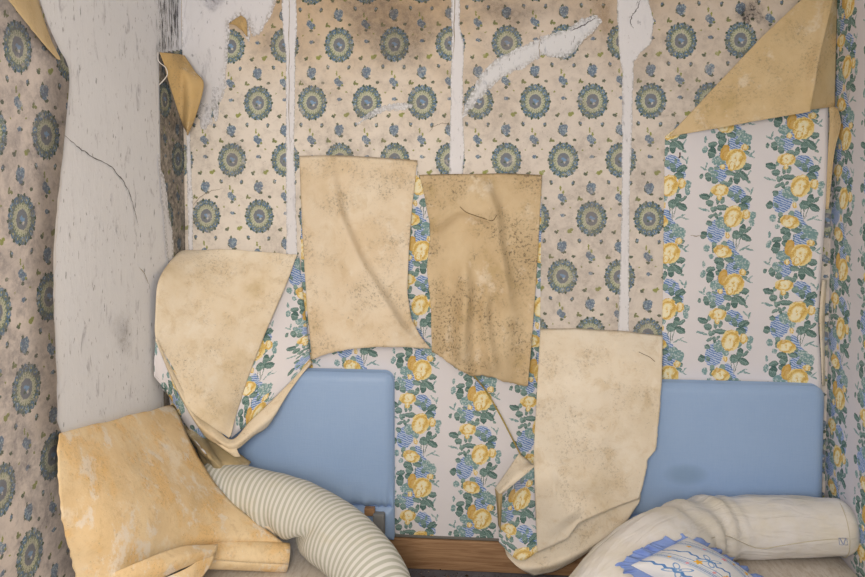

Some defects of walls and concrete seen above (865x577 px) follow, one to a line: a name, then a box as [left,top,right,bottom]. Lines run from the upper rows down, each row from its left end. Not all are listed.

crack [68,138,139,227]
flaking render [160,0,297,255]
spalling [449,0,602,174]
flaking render [617,0,654,331]